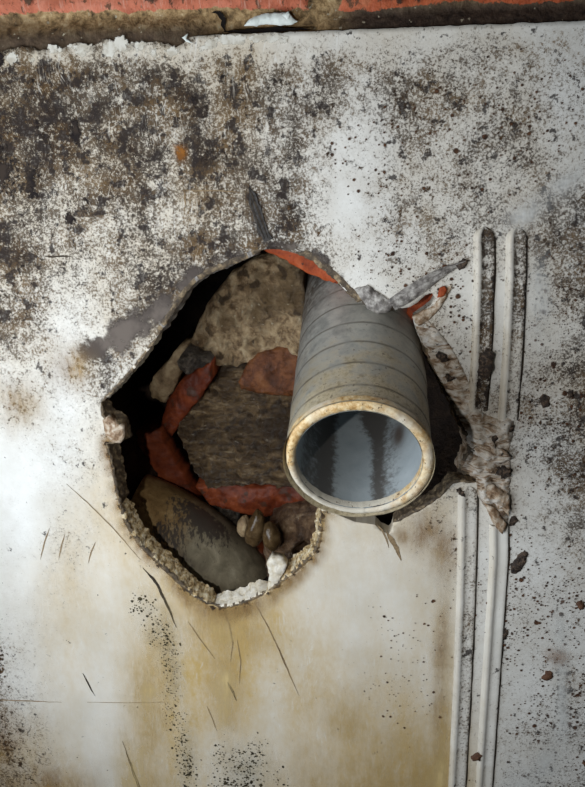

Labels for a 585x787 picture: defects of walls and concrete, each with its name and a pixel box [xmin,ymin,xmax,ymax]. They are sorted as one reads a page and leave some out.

peeling [47,43,92,57]
peeling [102,35,179,60]
peeling [182,11,298,53]
corrosion [175,145,185,161]
spalling [297,250,365,304]
spalling [100,188,329,613]
spalling [393,314,514,534]
leakage [420,517,458,572]
crack [143,568,176,626]
leakage [130,593,288,787]
leakage [0,716,59,787]
leakage [407,707,450,787]